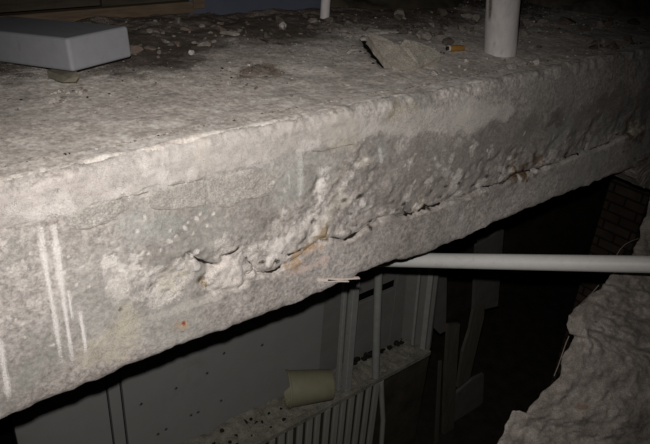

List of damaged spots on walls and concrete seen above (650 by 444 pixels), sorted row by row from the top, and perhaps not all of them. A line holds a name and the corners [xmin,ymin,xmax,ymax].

crack [523,134,623,172]
spalling [237,136,578,280]
crack [395,178,509,216]
crack [319,218,377,241]
crack [187,247,304,274]
damp [0,223,147,399]